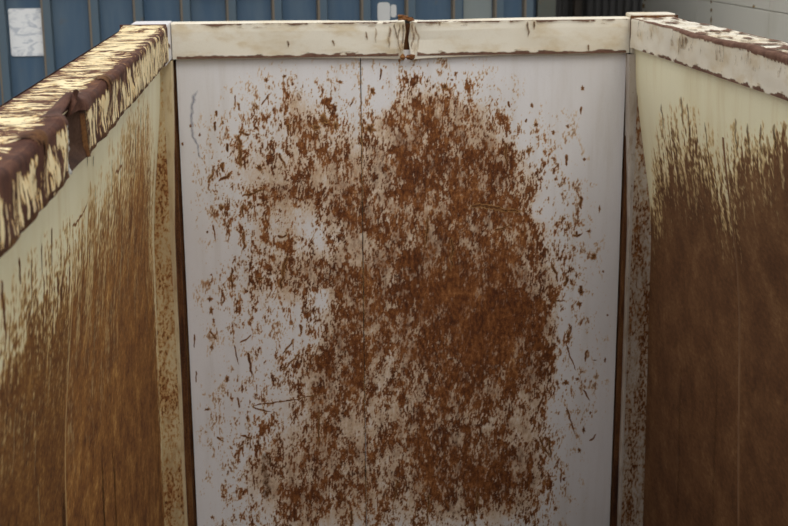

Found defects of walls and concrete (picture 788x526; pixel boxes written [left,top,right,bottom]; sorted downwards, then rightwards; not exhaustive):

corrosion [417,19,615,35]
corrosion [0,40,626,526]
corrosion [621,94,788,526]